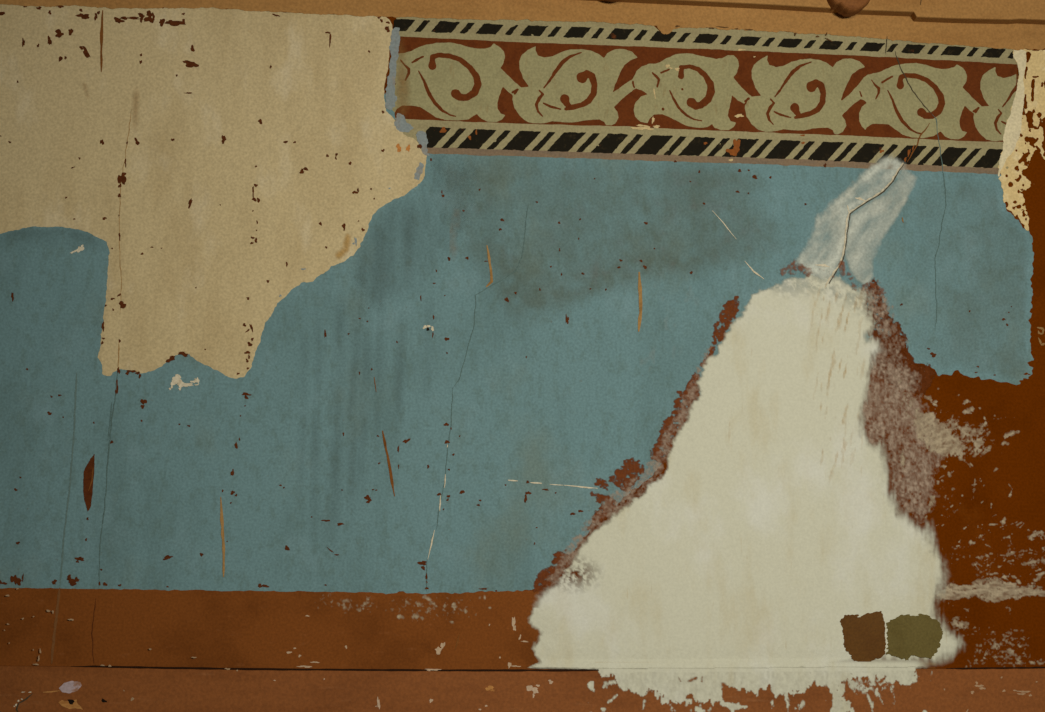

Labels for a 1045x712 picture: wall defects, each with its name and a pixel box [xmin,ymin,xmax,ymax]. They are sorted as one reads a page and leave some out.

peeling [0,4,432,394]
peeling [726,139,772,179]
crack [817,40,947,326]
peeling [998,49,1045,231]